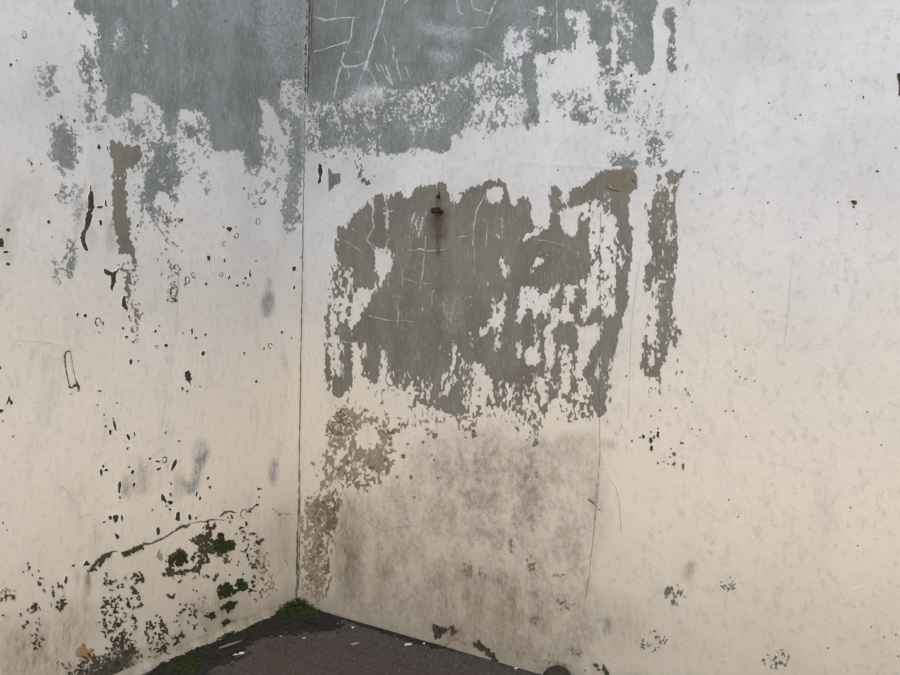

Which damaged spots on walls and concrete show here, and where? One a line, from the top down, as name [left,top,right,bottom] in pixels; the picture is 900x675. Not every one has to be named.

peeling [27,0,699,605]
crack [89,505,256,572]
leakage [193,515,264,601]
leakage [20,562,68,651]
peeling [75,643,93,662]
leakage [57,571,208,675]
leakage [432,624,454,640]
leakage [473,640,499,662]